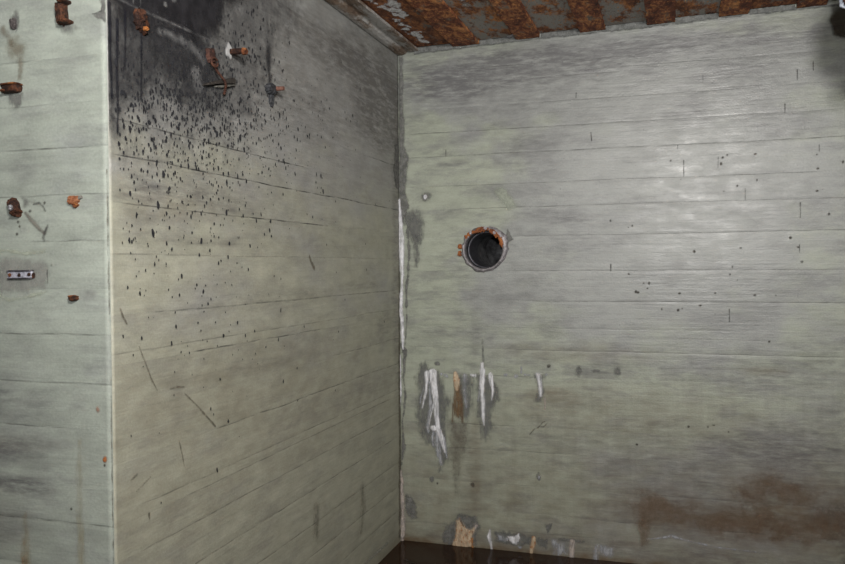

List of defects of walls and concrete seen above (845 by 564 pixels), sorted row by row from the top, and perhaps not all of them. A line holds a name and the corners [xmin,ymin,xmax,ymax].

leakage [405,213,422,266]
corrosion [457,226,504,256]
leakage [417,364,450,465]
leakage [459,363,498,437]
spalling [443,514,480,548]